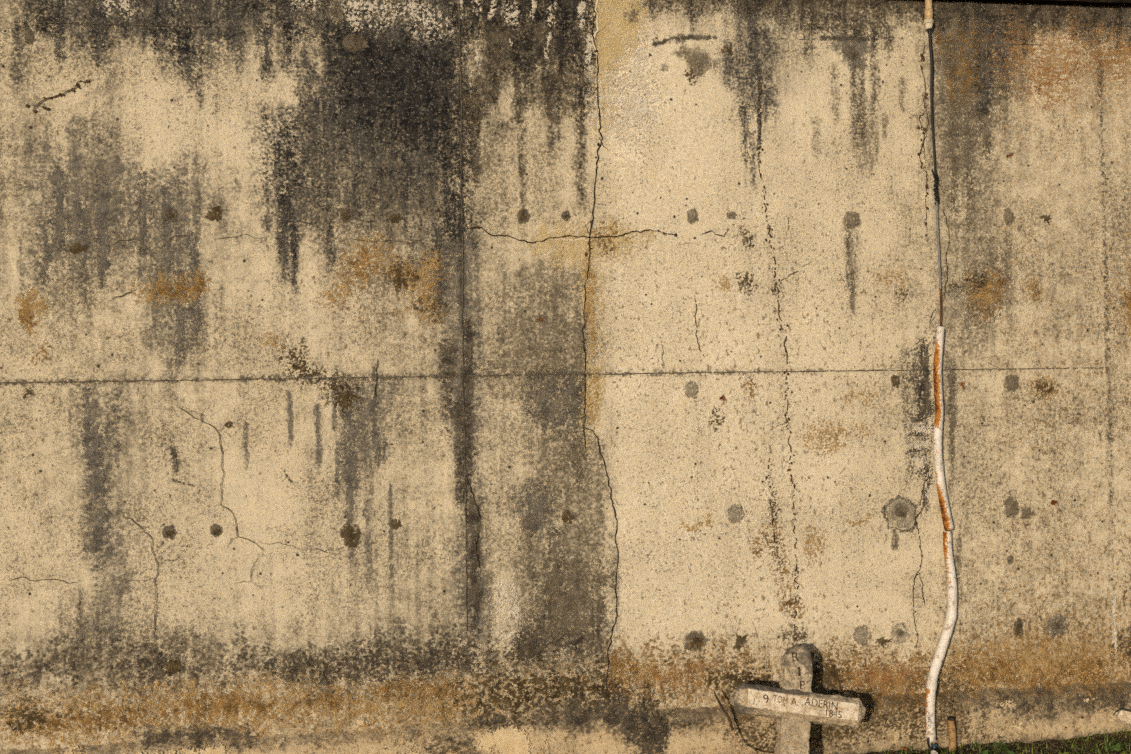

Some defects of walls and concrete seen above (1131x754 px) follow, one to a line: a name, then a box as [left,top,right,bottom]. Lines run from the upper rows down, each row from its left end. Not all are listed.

water stain [718,0,925,181]
rust [1006,20,1131,107]
water stain [0,0,725,754]
crack [473,0,729,697]
crack [756,79,811,640]
water stain [844,226,859,314]
water stain [902,322,957,513]
crack [913,477,928,646]
water stain [723,711,777,753]
water stain [809,687,1131,752]